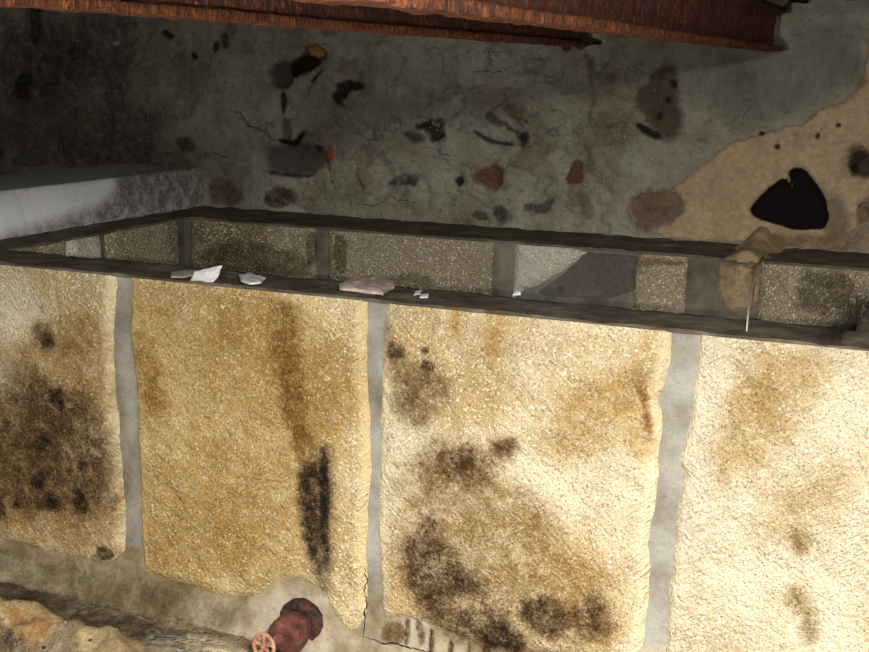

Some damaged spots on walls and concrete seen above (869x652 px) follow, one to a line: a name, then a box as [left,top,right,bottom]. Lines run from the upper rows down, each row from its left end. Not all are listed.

peeling [628,39,869,250]
leakage [301,463,328,550]
crack [363,569,432,652]
leakage [422,570,476,613]
leakage [457,616,519,652]